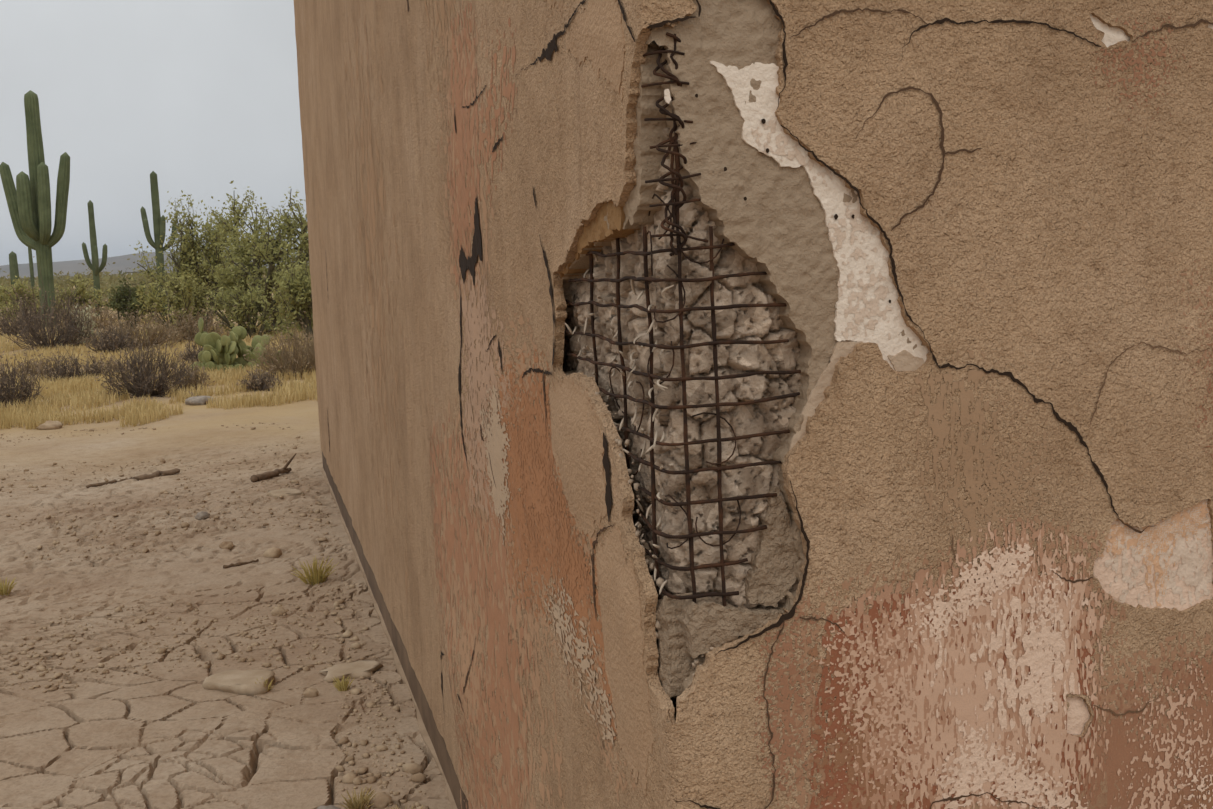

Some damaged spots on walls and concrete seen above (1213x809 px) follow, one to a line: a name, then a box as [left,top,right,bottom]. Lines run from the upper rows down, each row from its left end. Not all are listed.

spalling [542,34,557,61]
spalling [1090,14,1130,48]
crack [769,0,1213,533]
crack [458,188,555,486]
water stain [808,350,1213,809]
crack [1055,573,1093,583]
spalling [1093,499,1213,611]
crack [716,481,845,809]
corrosion [752,500,1213,809]
crack [1093,696,1159,716]
crack [675,800,720,809]
crack [930,792,1044,809]